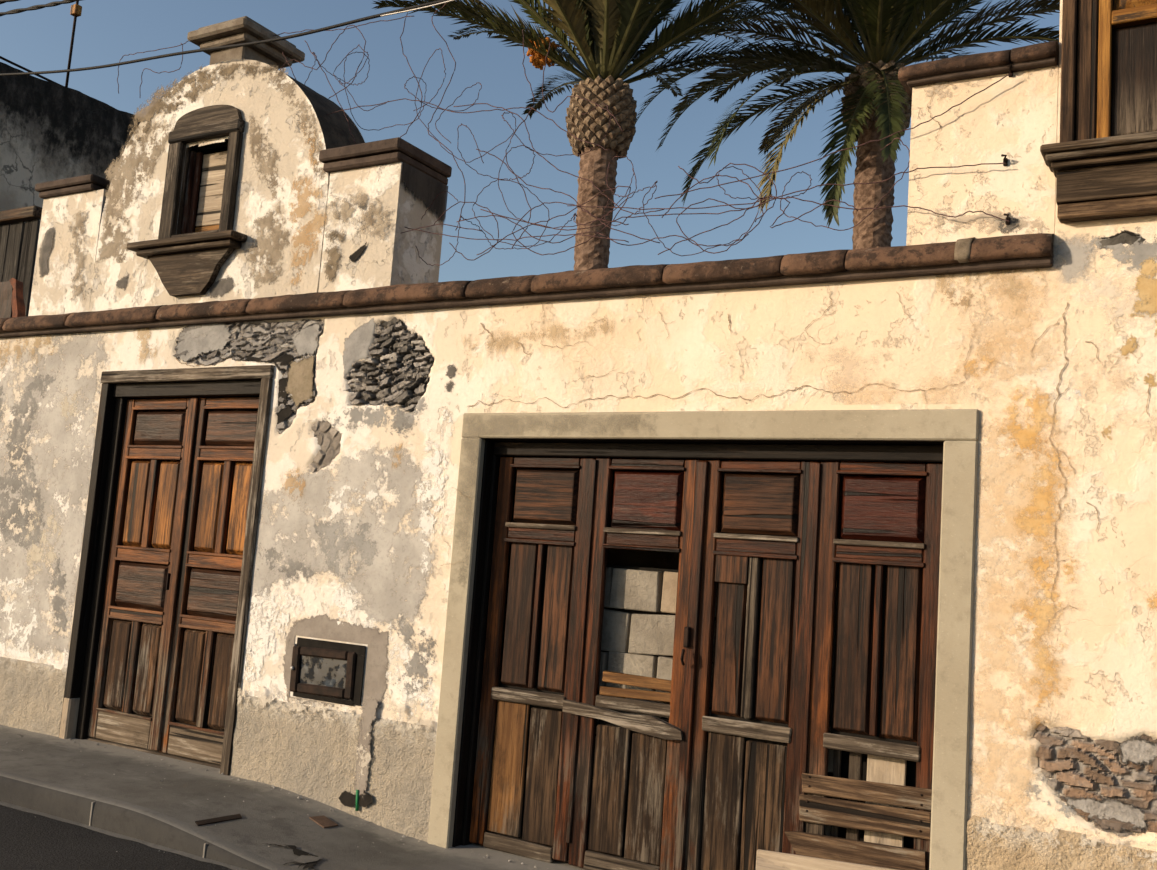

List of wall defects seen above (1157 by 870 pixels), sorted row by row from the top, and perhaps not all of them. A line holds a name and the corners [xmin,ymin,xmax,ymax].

spalling [209,277,233,298]
crack [805,287,836,344]
spalling [173,319,325,434]
spalling [445,365,457,392]
peeling [0,332,107,666]
peeling [242,317,455,717]
crack [467,301,1111,662]
damp [970,415,1157,863]
spalling [1015,724,1157,837]